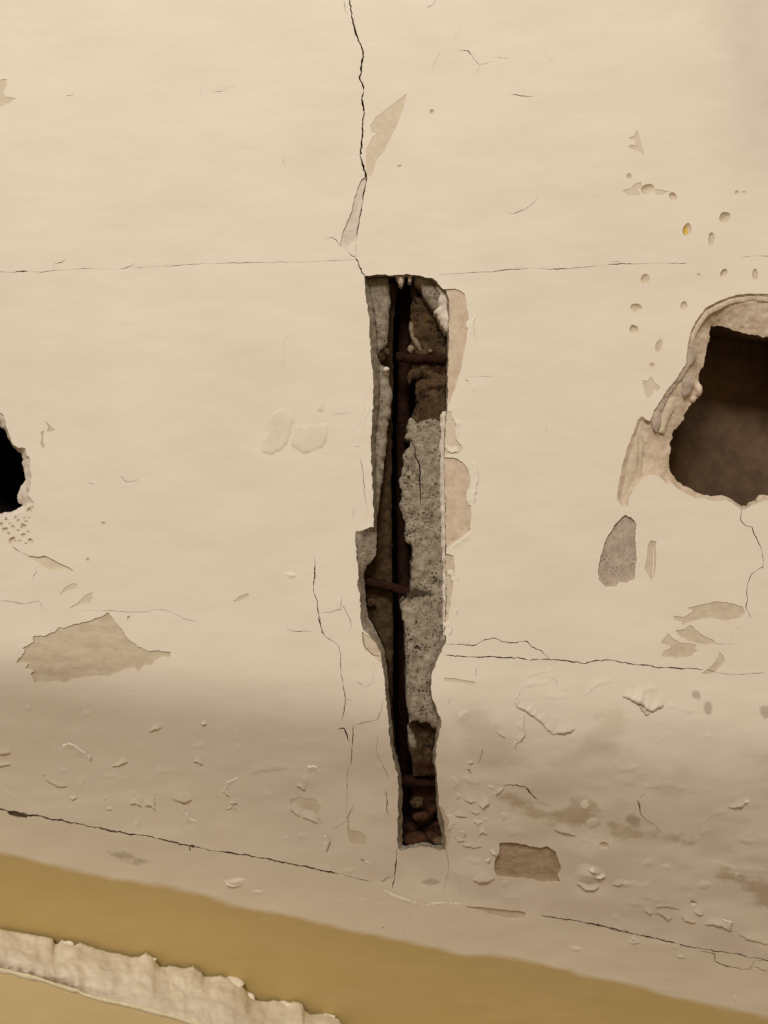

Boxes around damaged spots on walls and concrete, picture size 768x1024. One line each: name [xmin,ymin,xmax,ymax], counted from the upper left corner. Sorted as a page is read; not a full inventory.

crack [311,0,367,275]
spalling [598,269,768,587]
spalling [0,413,93,609]
corrosion [407,587,431,600]
spalling [355,274,561,919]
peeling [16,613,171,683]
crack [288,558,390,828]
crack [447,638,765,675]
corrosion [414,759,434,771]
crack [0,808,397,887]
spalling [0,929,342,1024]
crack [544,916,768,971]